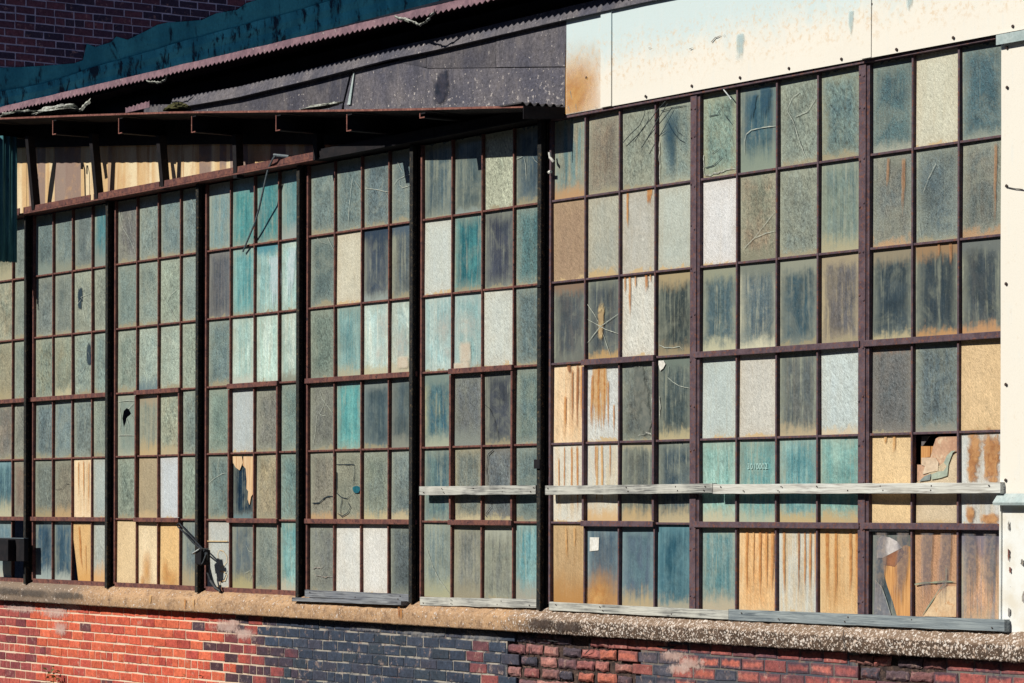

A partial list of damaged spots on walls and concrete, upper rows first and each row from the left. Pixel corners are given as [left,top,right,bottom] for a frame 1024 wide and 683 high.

corrosion [565,69,592,110]
corrosion [564,365,615,427]
corrosion [967,428,1000,482]
corrosion [966,506,998,524]
corrosion [745,533,785,586]
corrosion [798,533,858,590]